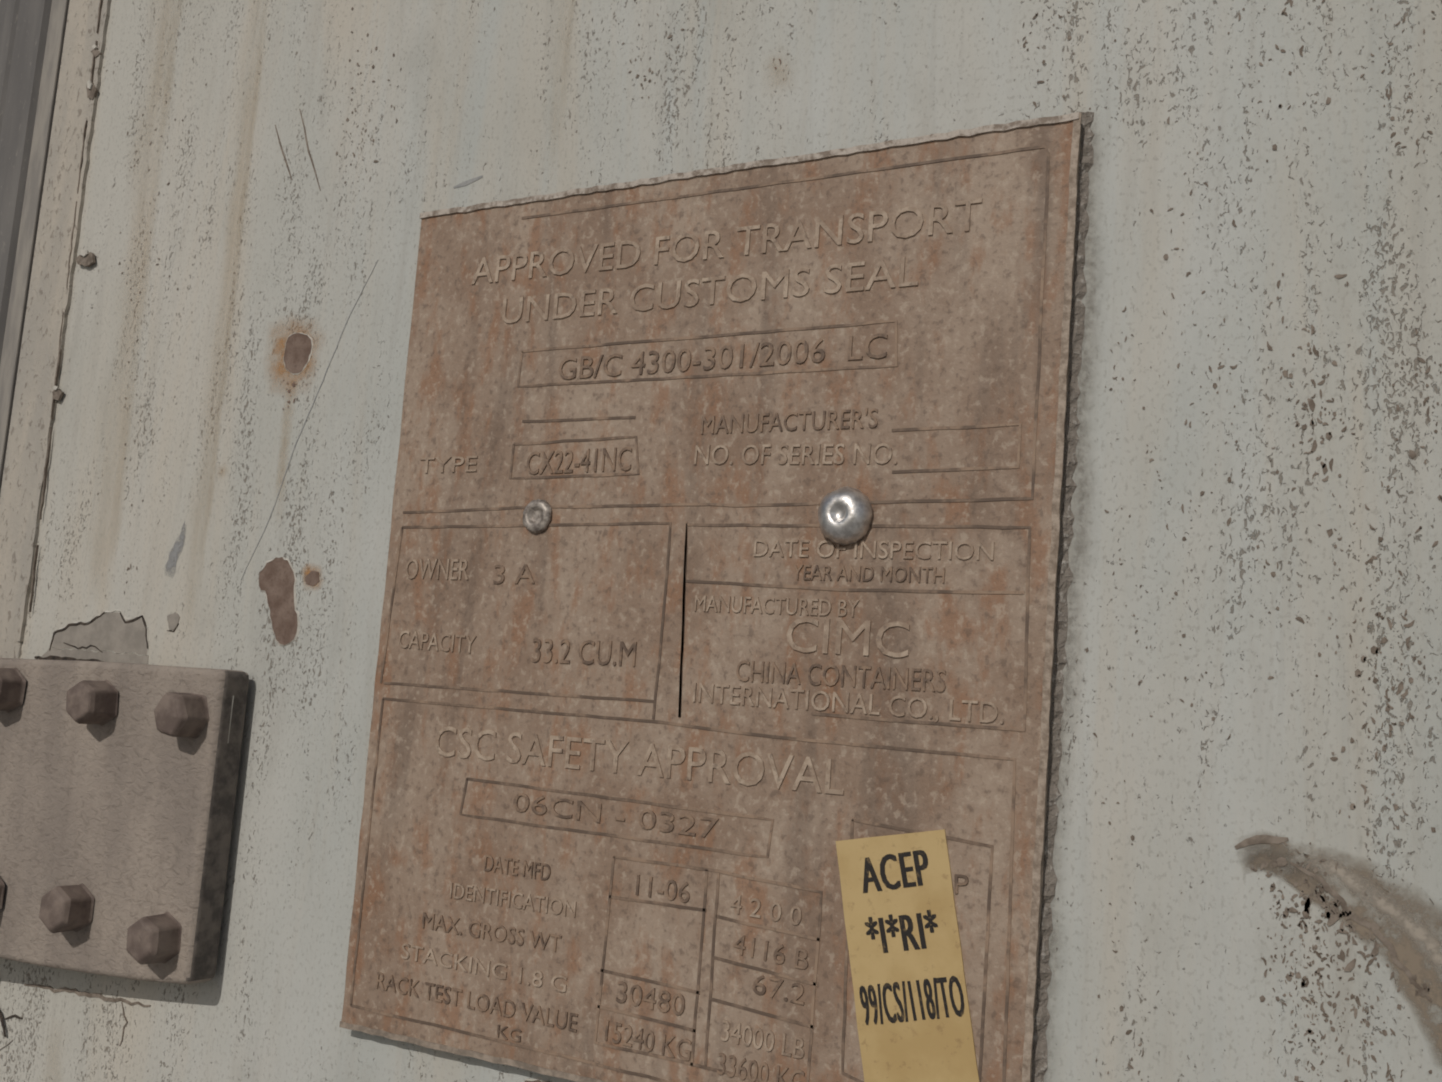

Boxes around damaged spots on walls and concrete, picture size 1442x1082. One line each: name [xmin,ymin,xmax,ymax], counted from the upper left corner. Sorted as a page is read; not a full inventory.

corrosion [277,332,313,410]
peeling [34,555,149,664]
peeling [167,612,180,632]
peeling [1250,842,1403,1082]
crack [0,984,151,1046]